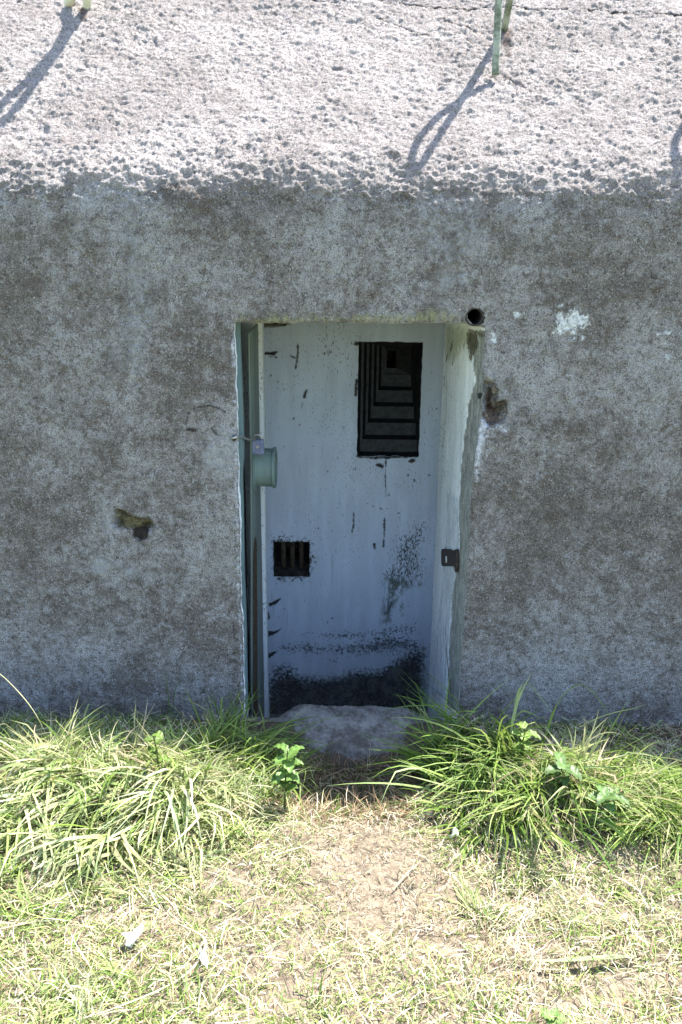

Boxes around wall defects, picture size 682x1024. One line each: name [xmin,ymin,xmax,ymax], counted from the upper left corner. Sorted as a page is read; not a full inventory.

spalling [113,509,153,540]
leakage [384,577,407,621]
leakage [269,650,428,716]